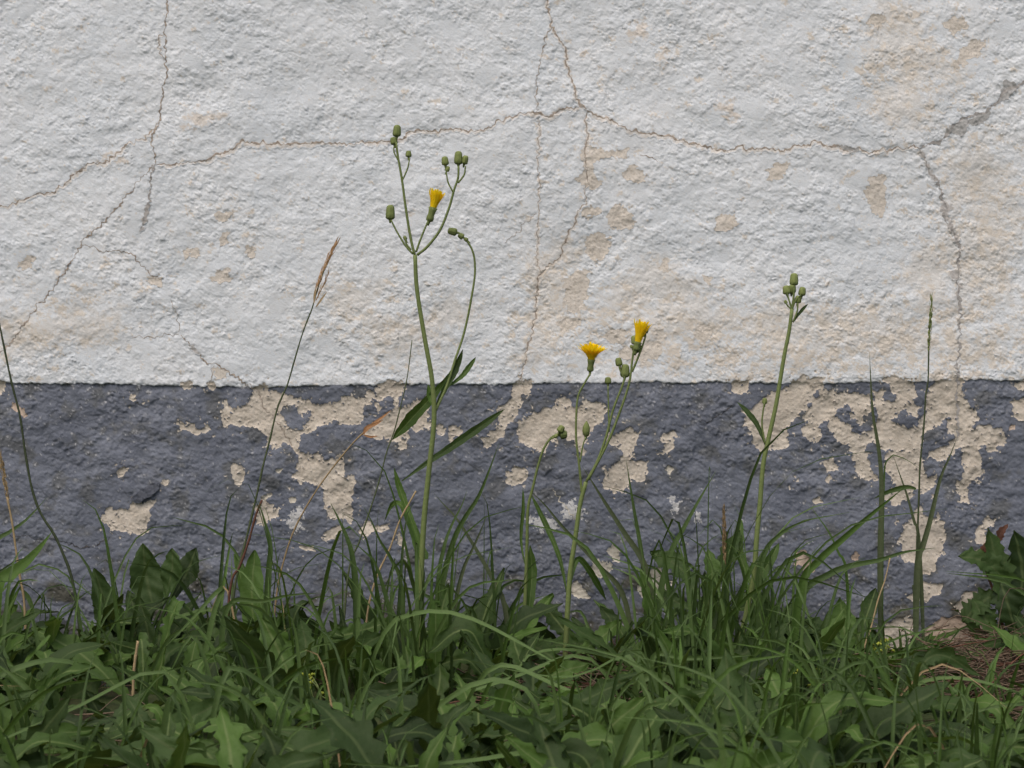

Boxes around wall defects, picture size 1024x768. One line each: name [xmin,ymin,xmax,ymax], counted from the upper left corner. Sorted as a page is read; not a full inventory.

crack [0,0,1024,447]
peeling [99,479,169,539]
peeling [174,366,463,557]
peeling [476,373,678,499]
peeling [725,371,1024,657]